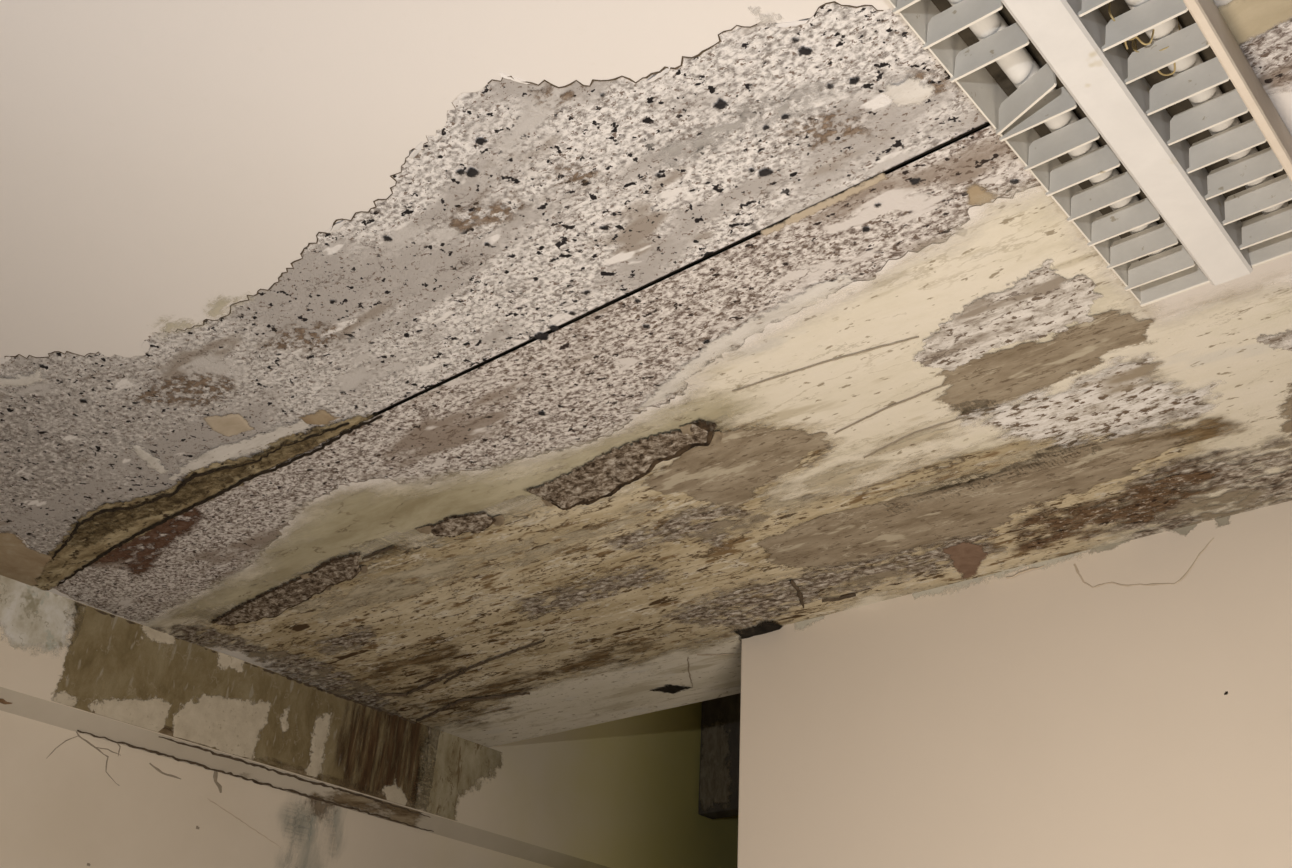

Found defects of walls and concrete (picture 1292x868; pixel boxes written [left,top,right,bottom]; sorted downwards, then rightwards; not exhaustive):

peeling [1240,19,1292,94]
crack [362,546,395,560]
peeling [0,1,1040,717]
leakage [51,192,1292,837]
crack [366,122,989,418]
crack [835,384,947,434]
crack [864,416,967,458]
peeling [608,384,1292,644]
peeling [914,260,1154,420]
peeling [1257,330,1292,351]